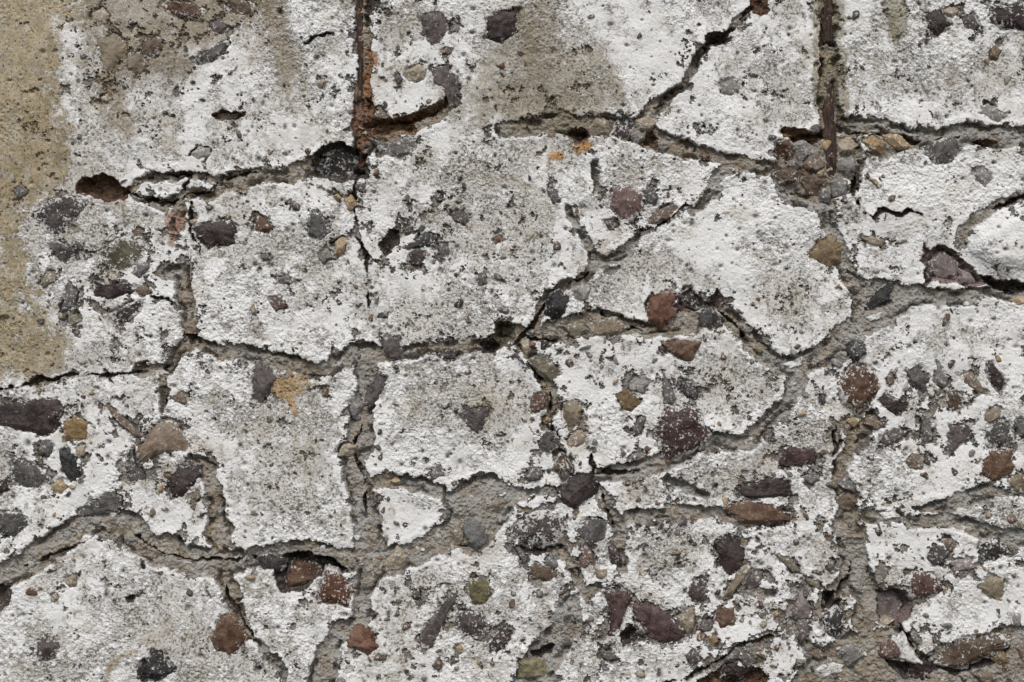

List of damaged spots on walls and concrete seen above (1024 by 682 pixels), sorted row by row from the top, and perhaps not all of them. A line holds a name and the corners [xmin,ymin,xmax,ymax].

rust [350,48,380,169]
crack [127,146,257,255]
crack [330,174,371,307]
spalling [494,0,1024,575]
crack [848,172,922,221]
crack [0,364,171,408]
crack [513,269,589,449]
spalling [0,263,574,682]
crack [588,453,640,528]
spalling [739,410,1024,682]
spalling [514,546,608,682]
crack [662,633,775,682]